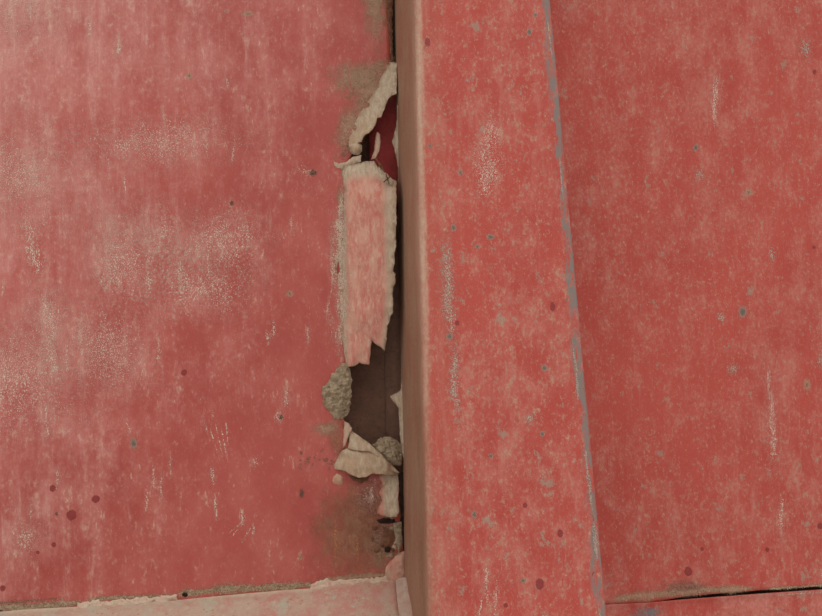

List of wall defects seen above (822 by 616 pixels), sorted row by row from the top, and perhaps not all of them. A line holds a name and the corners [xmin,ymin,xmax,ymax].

peeling [326,161,397,367]
peeling [377,474,399,517]